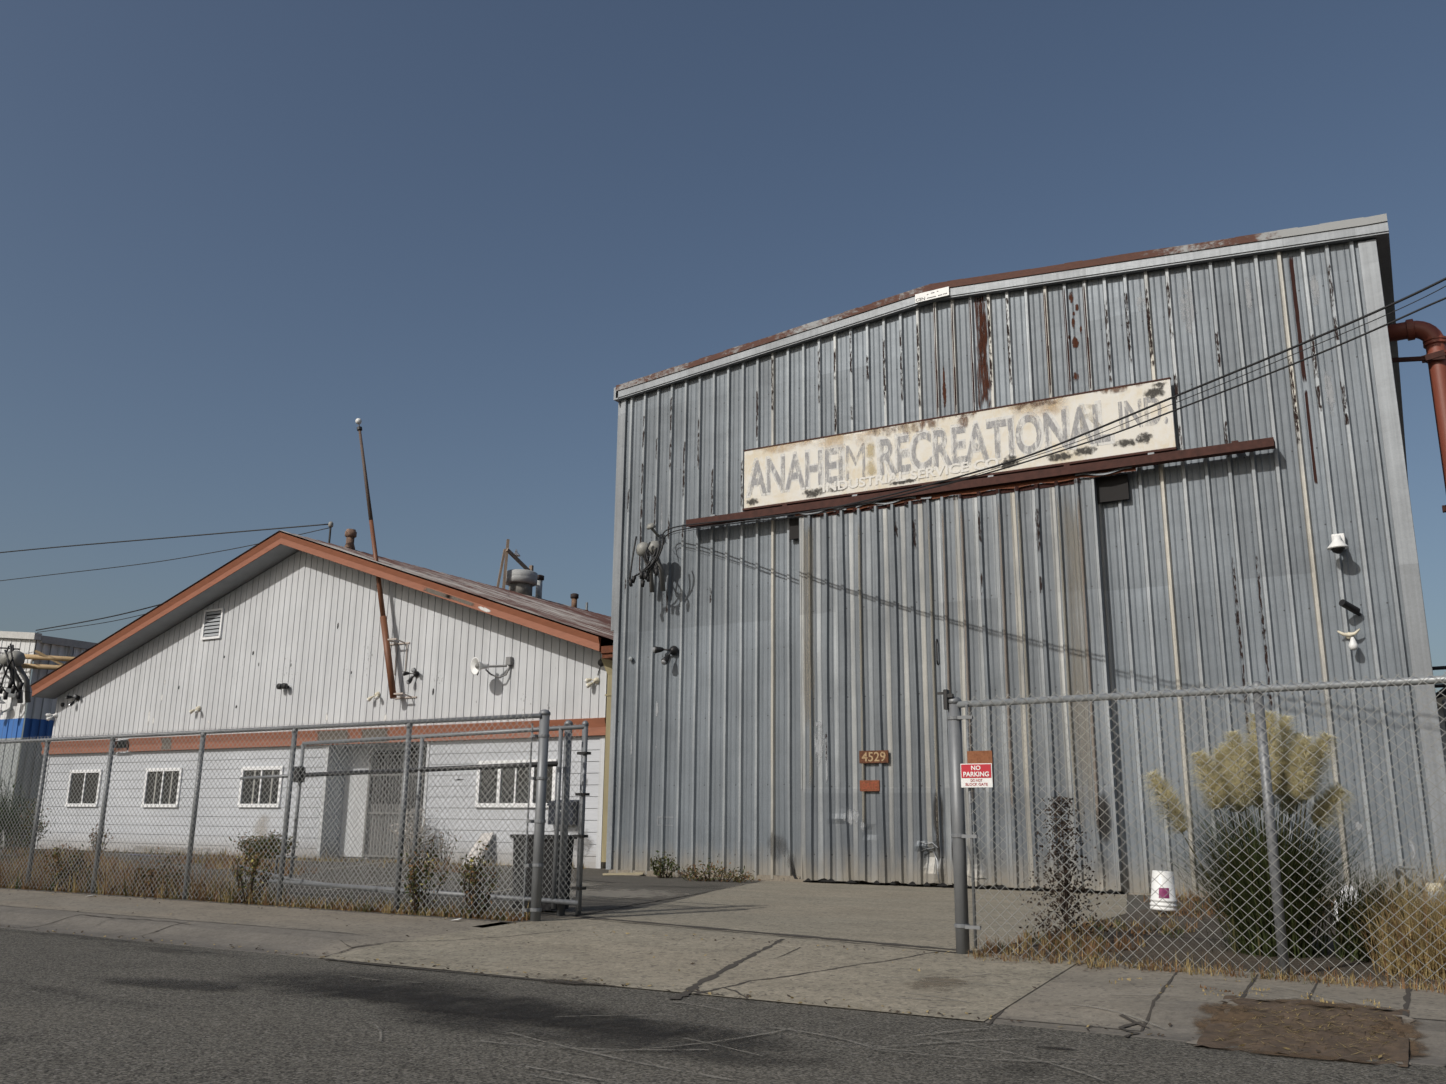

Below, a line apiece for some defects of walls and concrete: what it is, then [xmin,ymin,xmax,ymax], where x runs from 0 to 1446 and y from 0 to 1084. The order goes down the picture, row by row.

corrosion [874,297,992,434]
corrosion [1289,257,1318,483]
peeling [1049,447,1097,461]
peeling [1114,433,1152,447]
peeling [804,486,845,497]
crack [668,939,935,1002]